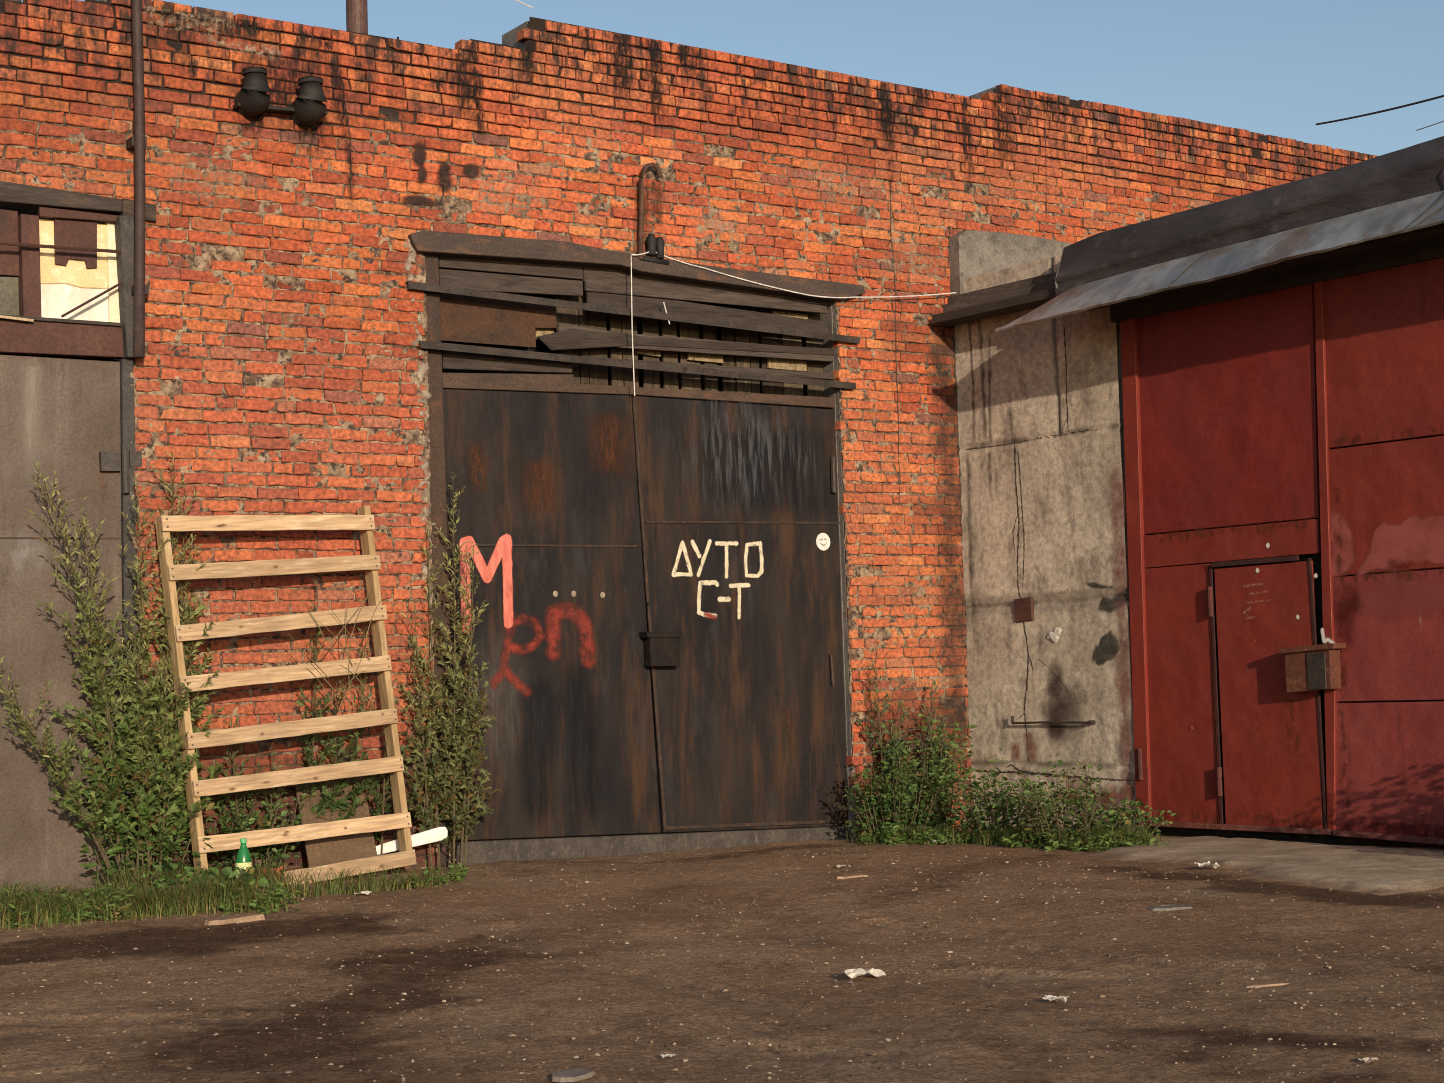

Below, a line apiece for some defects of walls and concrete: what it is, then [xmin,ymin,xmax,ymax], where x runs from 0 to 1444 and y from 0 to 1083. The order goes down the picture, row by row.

damp [147,6,275,55]
damp [334,65,354,183]
damp [471,41,484,131]
damp [519,46,534,75]
damp [648,40,662,113]
damp [679,46,697,68]
damp [881,83,893,145]
damp [961,98,971,169]
peeling [1314,511,1444,578]
damp [1050,671,1061,693]